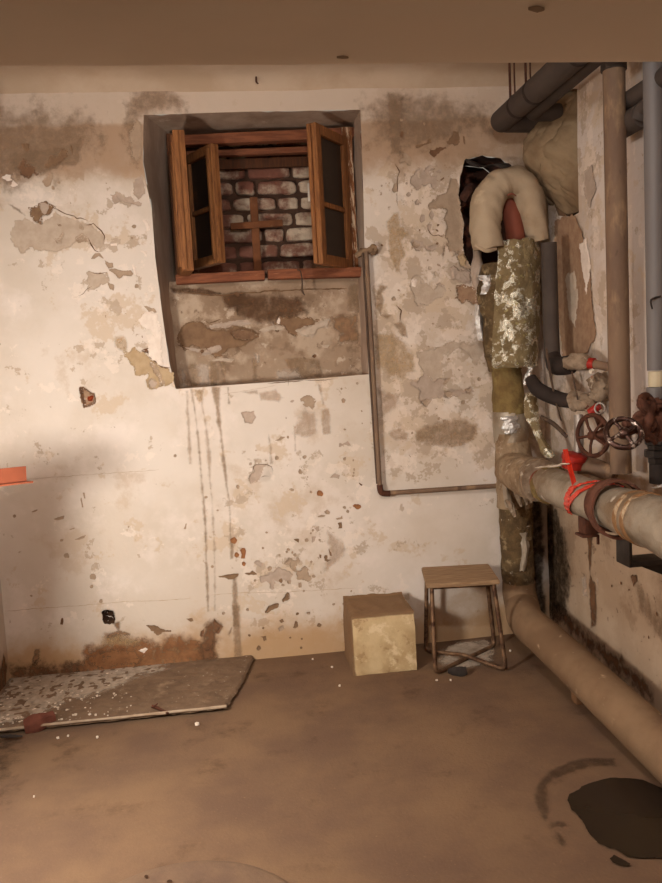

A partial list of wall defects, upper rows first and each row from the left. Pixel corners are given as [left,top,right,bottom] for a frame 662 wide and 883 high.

peeling [10,201,139,292]
crack [54,208,105,252]
spalling [399,131,511,306]
peeling [554,215,596,356]
spalling [79,387,96,408]
peeling [117,306,174,390]
damp [182,361,225,424]
damp [279,359,321,378]
corrosion [78,625,215,672]
damp [199,579,241,660]
damp [532,501,652,699]
damp [536,759,613,825]